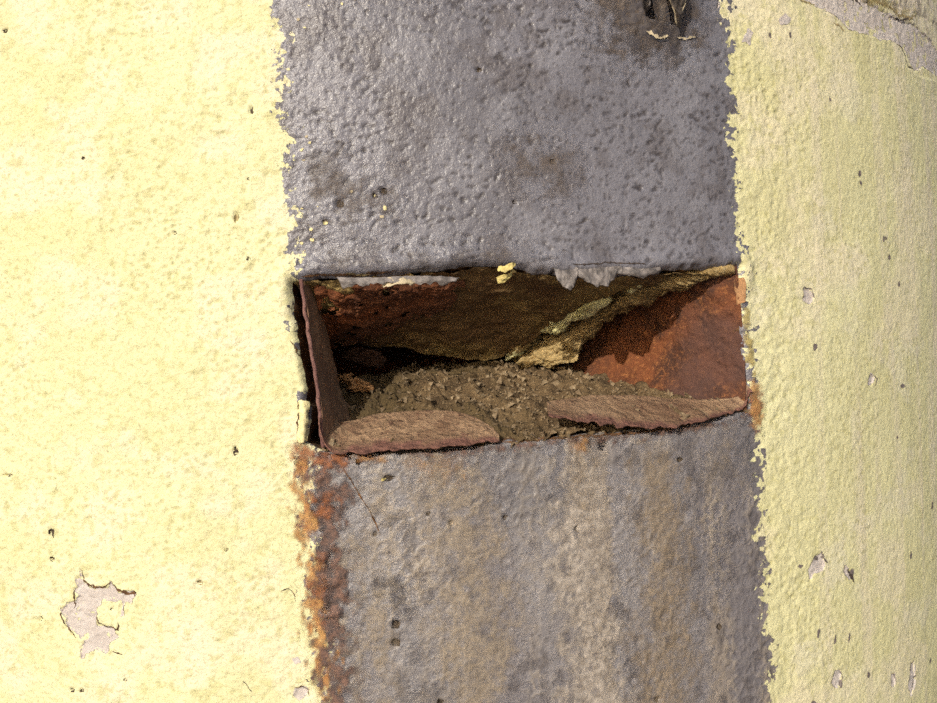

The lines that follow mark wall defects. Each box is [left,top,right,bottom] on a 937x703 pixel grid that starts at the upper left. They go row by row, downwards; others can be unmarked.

crack [855,0,917,22]
peeling [805,0,937,76]
peeling [337,276,459,289]
peeling [496,263,516,284]
peeling [554,266,661,291]
peeling [734,277,746,305]
rust [338,345,388,393]
peeling [297,400,310,444]
rust [656,421,712,435]
rust [291,445,383,703]
peeling [60,570,136,659]